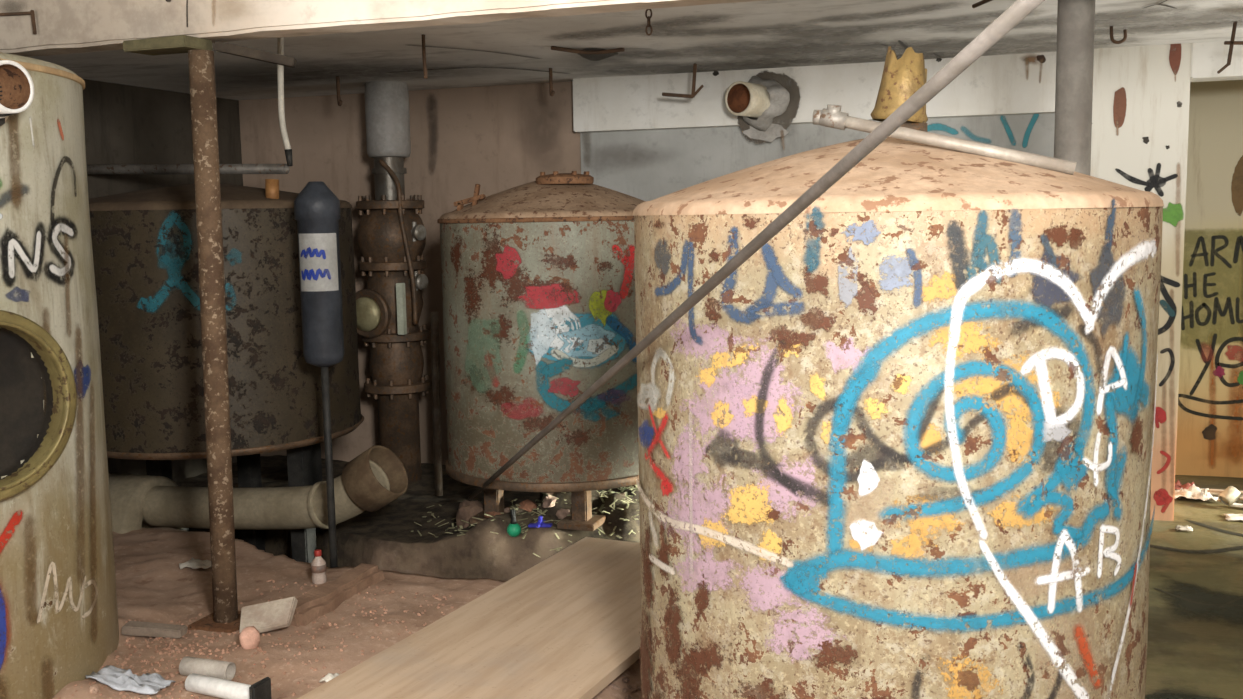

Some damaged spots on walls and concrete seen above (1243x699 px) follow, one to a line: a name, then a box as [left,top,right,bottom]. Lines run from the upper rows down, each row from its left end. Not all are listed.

corrosion [742,214,761,230]
corrosion [1038,222,1086,250]
corrosion [450,216,582,349]
corrosion [702,293,723,327]
corrosion [769,267,839,351]
corrosion [854,274,882,320]
corrosion [463,364,517,411]
corrosion [1129,409,1143,467]
corrosion [766,507,780,521]
corrosion [638,517,733,699]
corrosion [807,640,865,670]
corrosion [730,677,788,699]